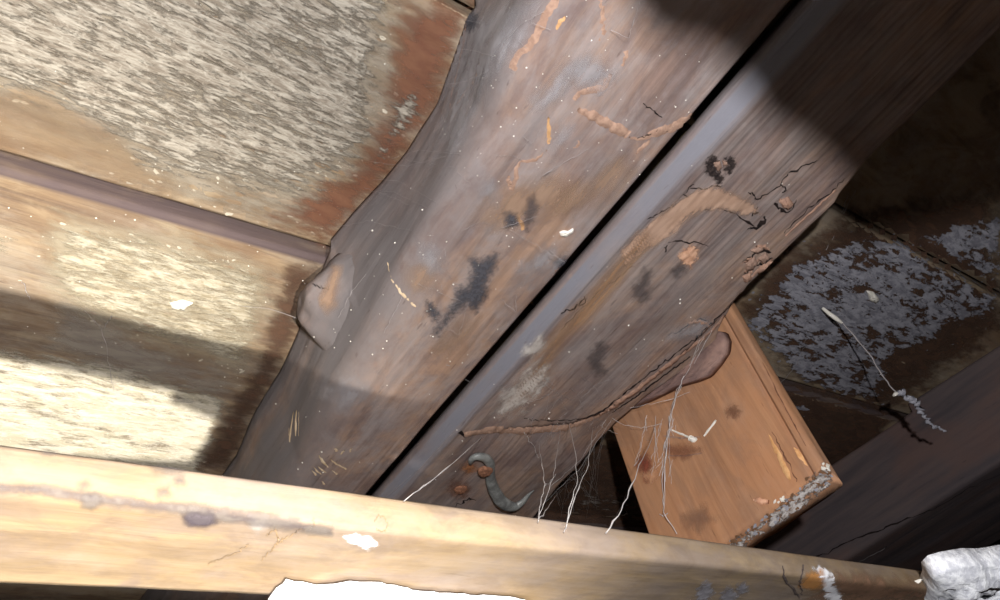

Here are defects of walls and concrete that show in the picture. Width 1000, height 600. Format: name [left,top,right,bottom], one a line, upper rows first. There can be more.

damp [297,2,477,239]
damp [506,200,536,227]
crack [648,161,844,282]
damp [427,255,497,334]
damp [743,195,1000,465]